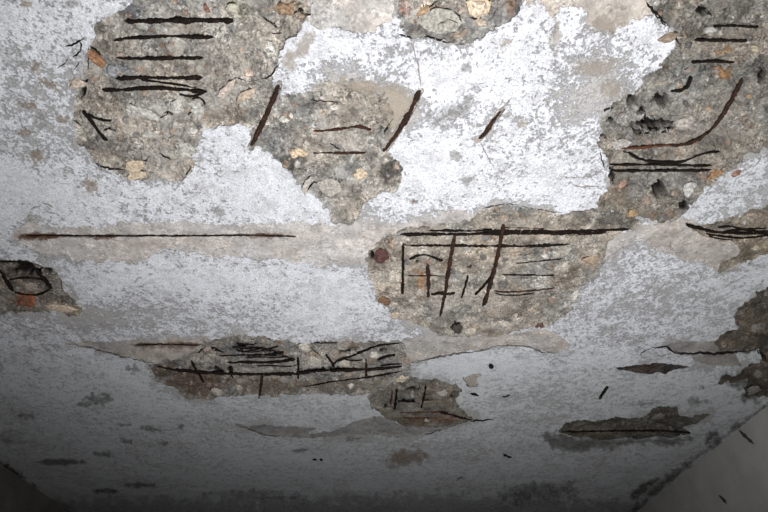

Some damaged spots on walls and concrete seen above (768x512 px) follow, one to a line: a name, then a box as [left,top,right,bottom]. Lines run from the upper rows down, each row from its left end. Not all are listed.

spalling [69,0,536,182]
spalling [538,0,768,274]
rust [18,232,57,241]
spalling [0,78,641,438]
spalling [617,287,768,399]
crack [641,346,767,361]
spalling [559,406,710,440]